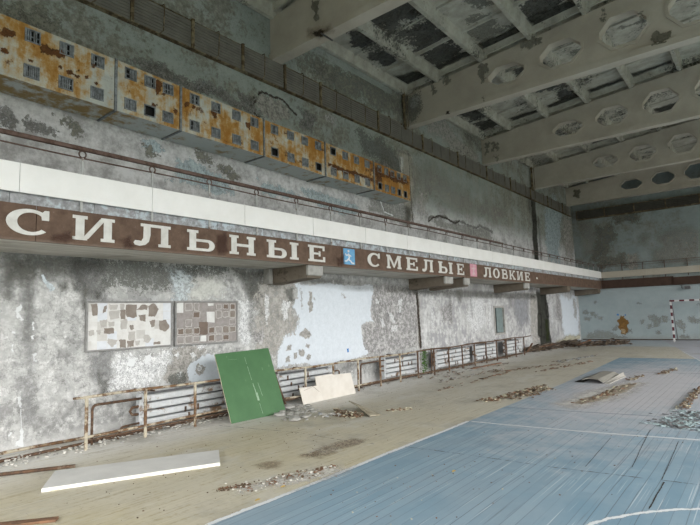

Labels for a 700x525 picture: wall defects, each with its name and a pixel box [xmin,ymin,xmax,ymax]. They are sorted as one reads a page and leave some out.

rust [0,27,16,38]
peeling [464,0,514,47]
rust [40,43,98,86]
peeling [535,85,577,100]
rust [328,162,409,185]
peeling [281,288,315,320]
peeling [286,328,312,362]